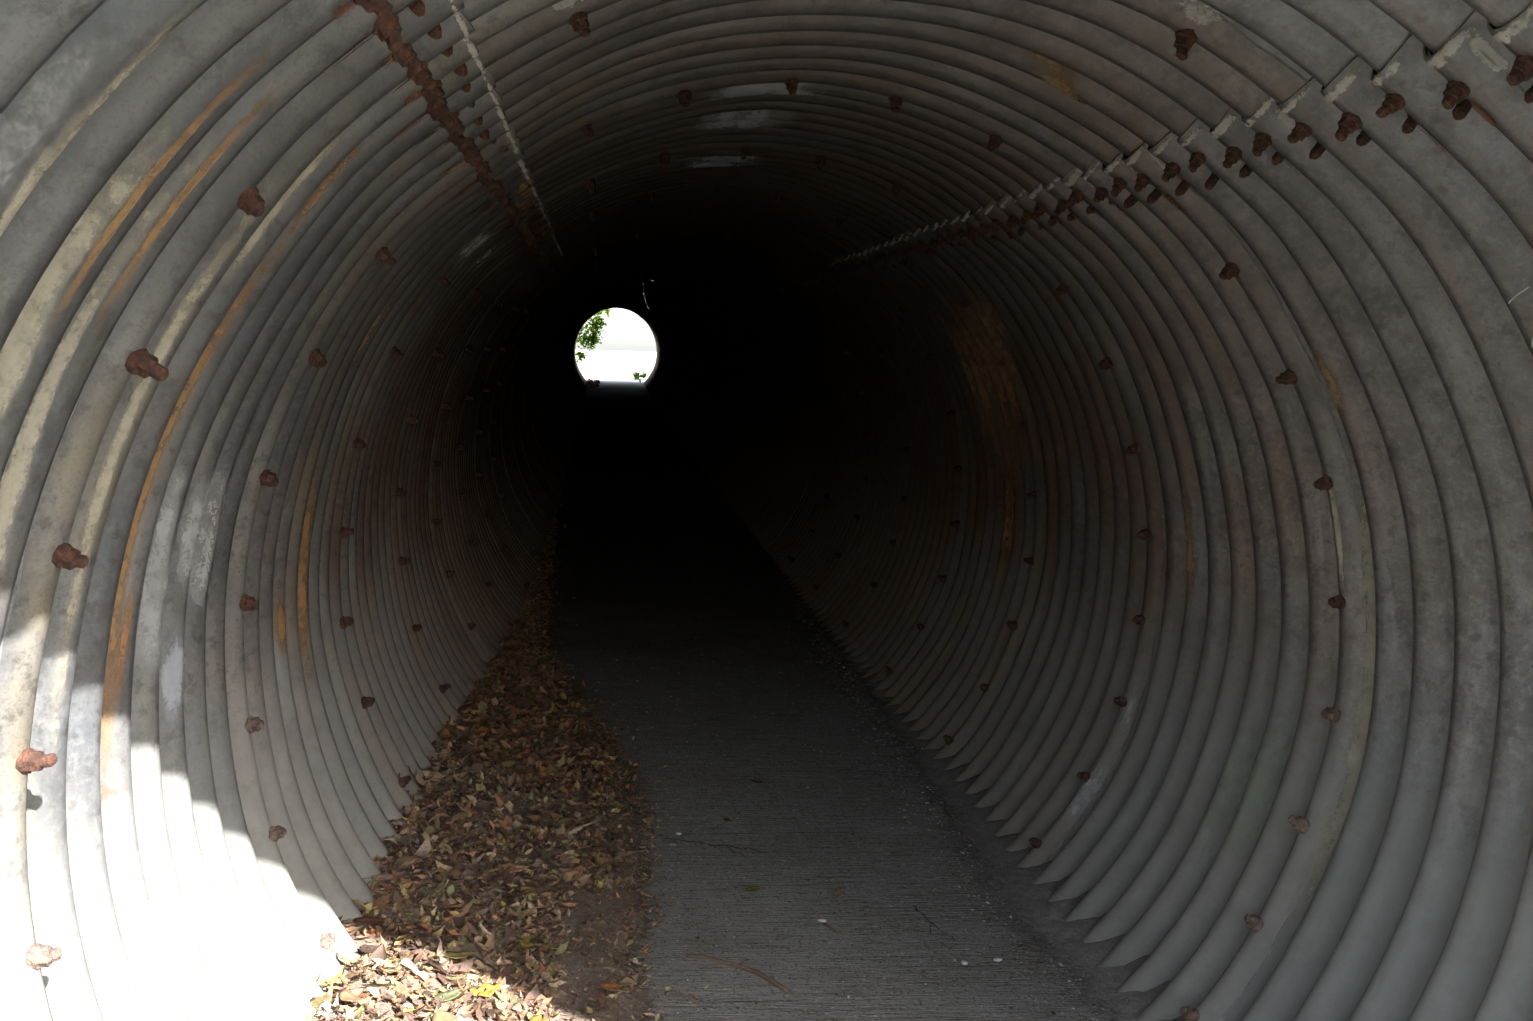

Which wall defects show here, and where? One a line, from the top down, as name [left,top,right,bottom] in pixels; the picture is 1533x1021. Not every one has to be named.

corrosion [448,0,563,280]
corrosion [552,0,583,11]
corrosion [794,61,1400,288]
corrosion [1180,0,1221,25]
corrosion [1425,2,1533,72]
corrosion [101,284,252,729]